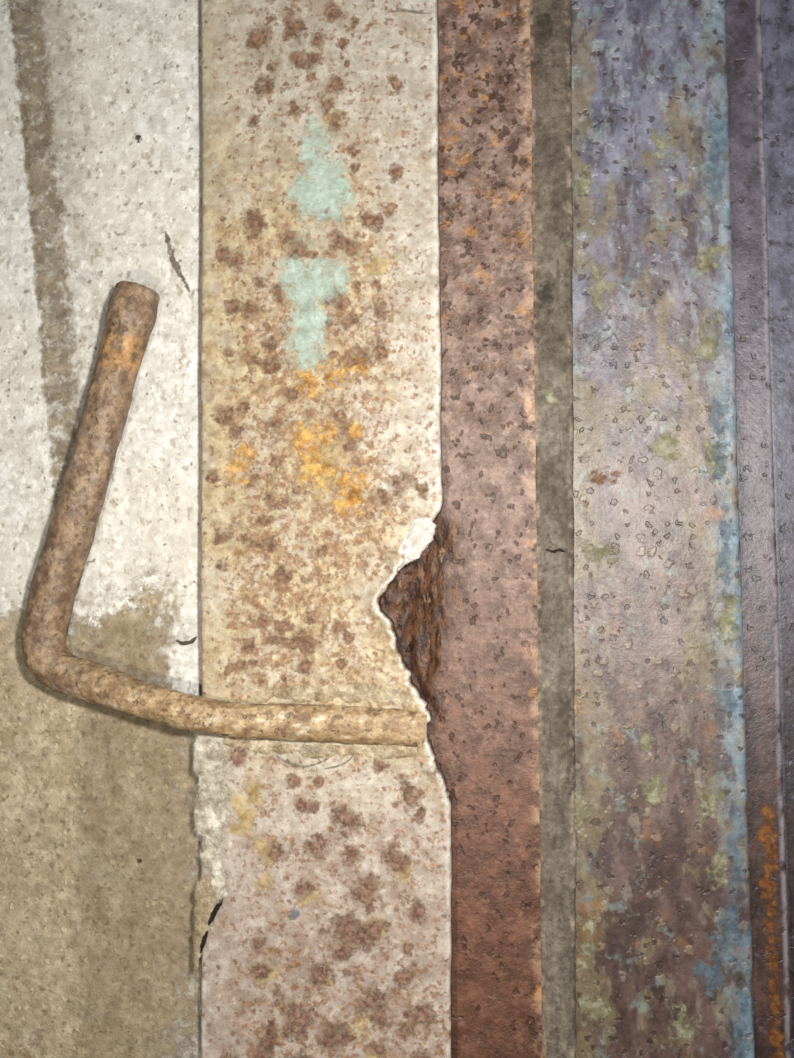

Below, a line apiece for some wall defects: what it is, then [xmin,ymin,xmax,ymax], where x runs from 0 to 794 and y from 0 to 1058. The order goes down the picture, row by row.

rust [245,9,323,83]
rust [322,5,360,131]
rust [224,299,281,374]
rust [215,410,429,553]
peeling [398,517,437,571]
rust [380,0,543,1058]
water stain [66,573,178,689]
rust [225,612,321,677]
water stain [0,608,202,1058]
rust [286,774,366,867]
rust [311,873,390,990]
rust [249,938,438,1058]